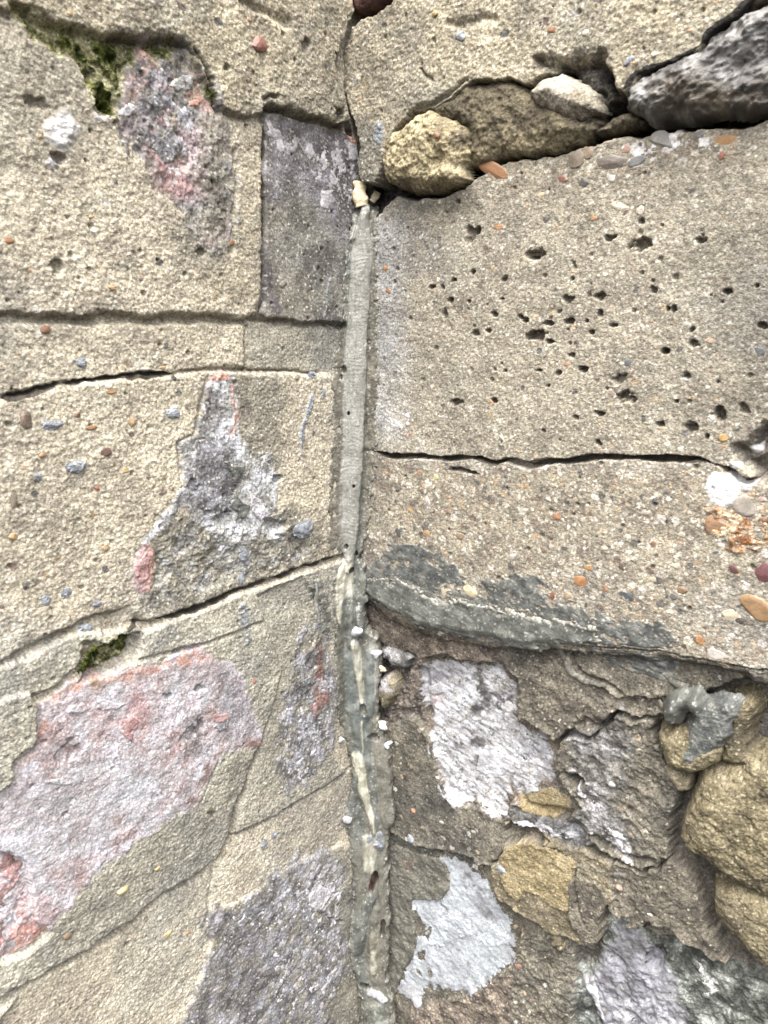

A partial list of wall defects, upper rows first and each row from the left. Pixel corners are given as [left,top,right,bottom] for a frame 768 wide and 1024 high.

crack [622,0,757,90]
crack [344,121,352,137]
crack [0,369,171,402]
spalling [126,368,288,598]
crack [374,450,768,481]
crack [127,556,335,633]